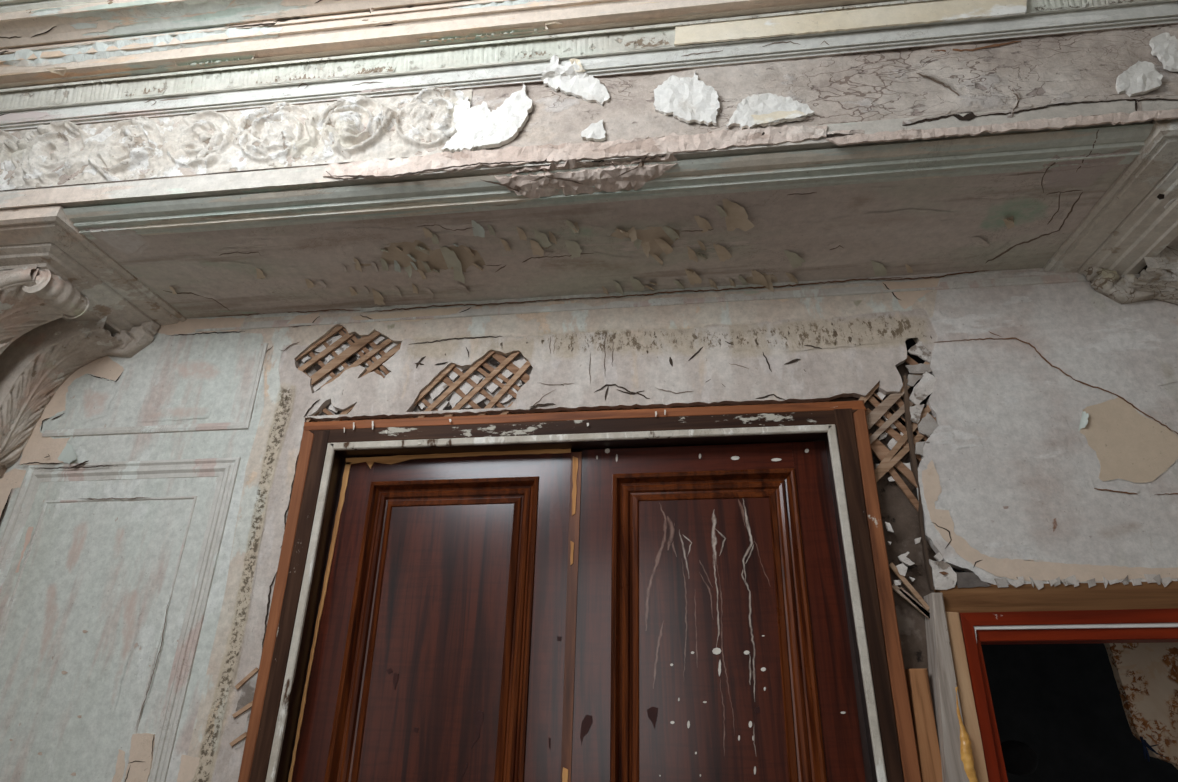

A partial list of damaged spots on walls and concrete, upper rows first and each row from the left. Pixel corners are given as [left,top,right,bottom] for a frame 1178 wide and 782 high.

spalling [323,109,1178,180]
peeling [378,220,511,283]
crack [163,41,1178,371]
crack [934,328,1178,434]
peeling [0,356,124,523]
peeling [922,467,1178,590]
peeling [1078,397,1178,483]
crack [1094,484,1178,495]